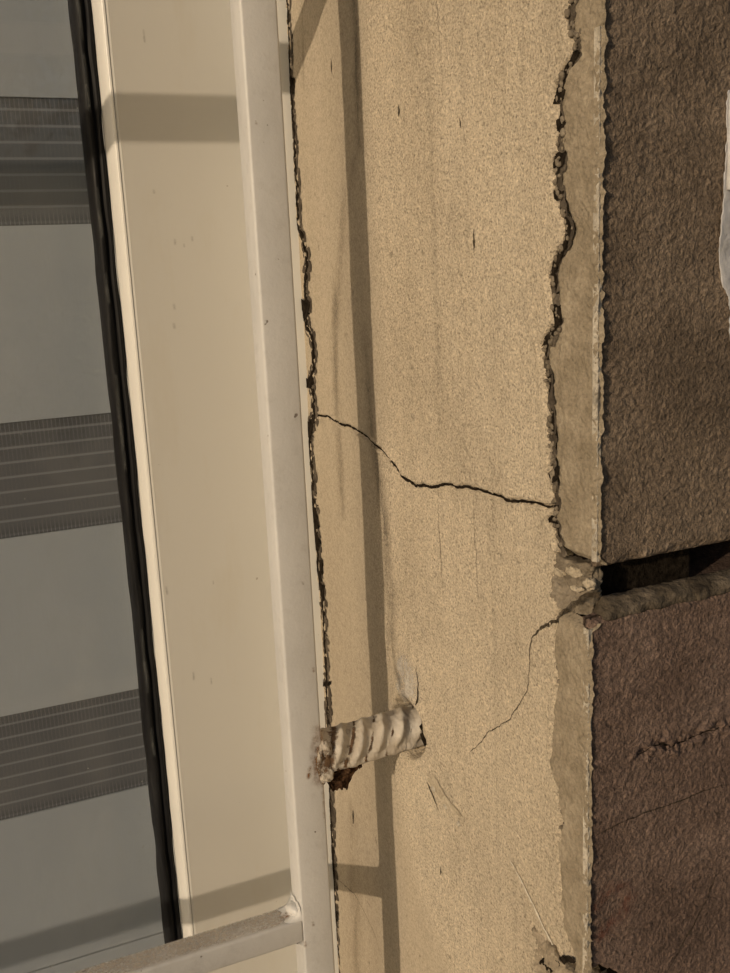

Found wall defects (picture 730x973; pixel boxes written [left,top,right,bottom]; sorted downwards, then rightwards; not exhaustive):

crack [286,0,581,728]
spalling [550,552,603,615]
crack [470,592,600,752]
crack [640,726,730,758]
rust [308,749,362,792]
crack [606,790,705,830]
crack [329,787,340,973]
flaking render [531,926,576,973]
flaking render [591,964,618,973]